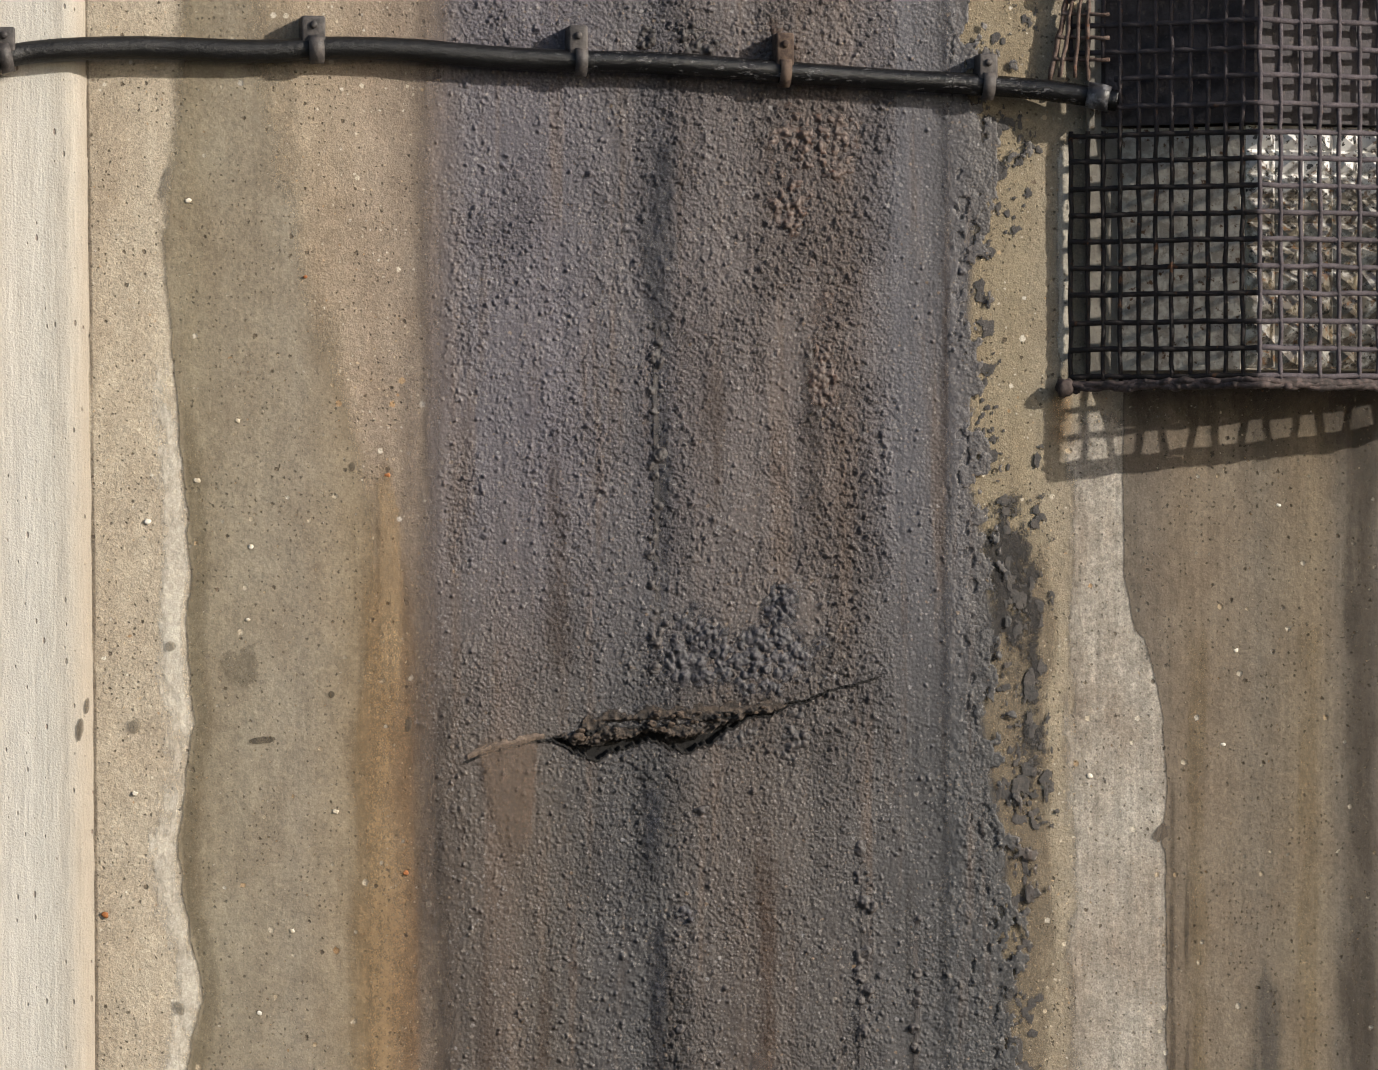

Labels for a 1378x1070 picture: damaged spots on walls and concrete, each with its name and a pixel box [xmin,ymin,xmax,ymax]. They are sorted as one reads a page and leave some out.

leakage [426,0,955,72]
peeling [944,0,1039,73]
leakage [416,63,992,1070]
peeling [943,94,1060,1070]
rust [355,587,419,1070]
crack [465,676,880,763]
leakage [969,769,1009,1024]